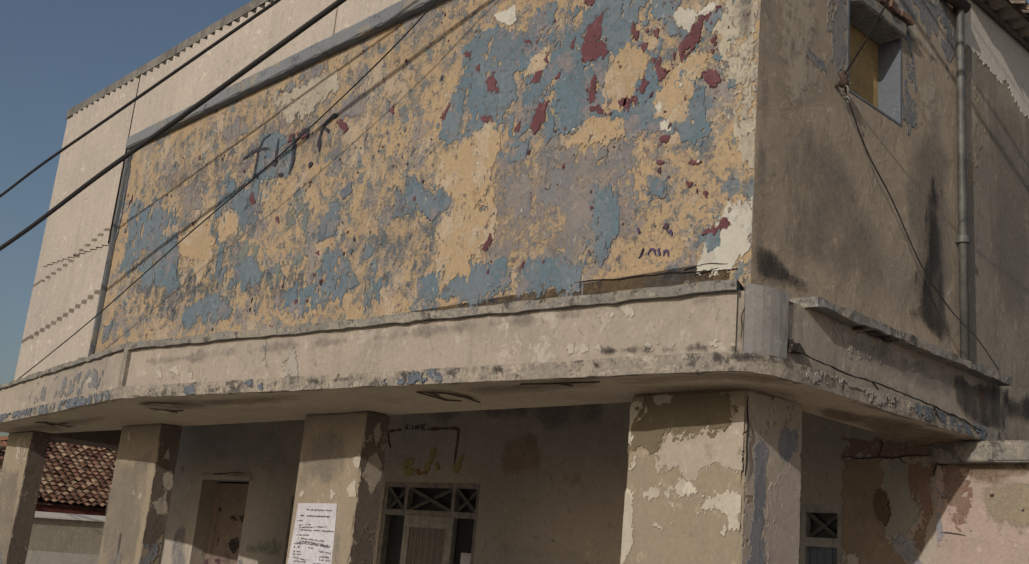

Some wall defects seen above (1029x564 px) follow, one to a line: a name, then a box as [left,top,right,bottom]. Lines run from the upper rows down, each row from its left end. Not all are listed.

peeling [116,62,395,331]
peeling [380,0,760,307]
peeling [595,306,635,318]
damp [911,180,949,336]
peeling [895,0,1029,188]
peeling [330,412,390,564]
peeling [620,389,802,564]
damp [955,376,1029,429]